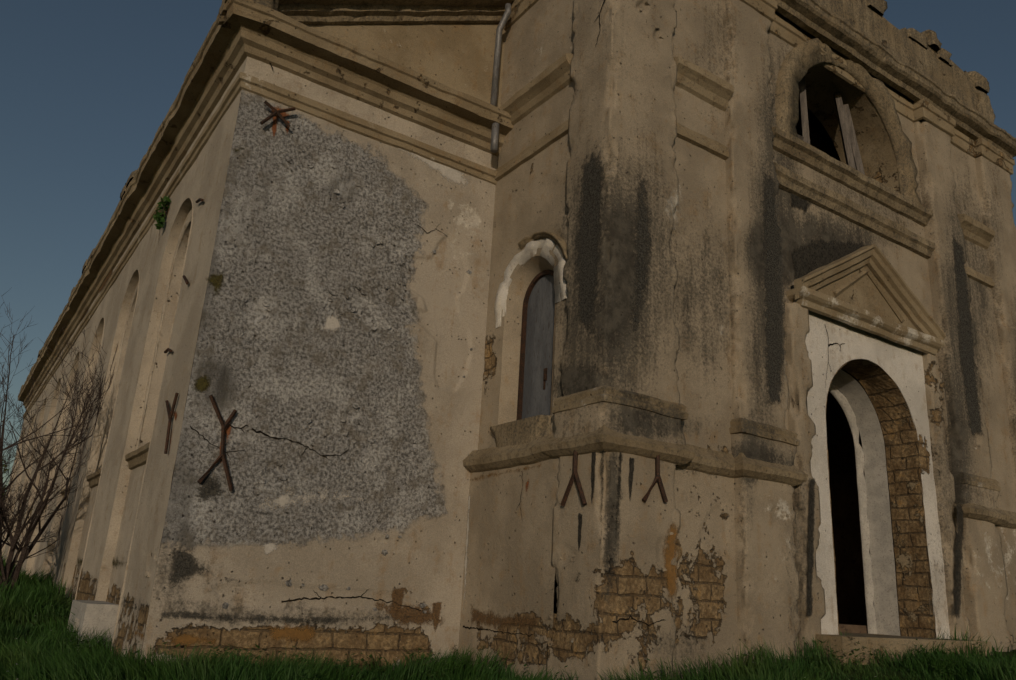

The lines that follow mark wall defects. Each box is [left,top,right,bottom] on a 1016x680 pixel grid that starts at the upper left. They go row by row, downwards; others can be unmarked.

leakage [572,145,607,332]
leakage [630,177,653,333]
crack [190,425,348,461]
crack [281,589,429,614]